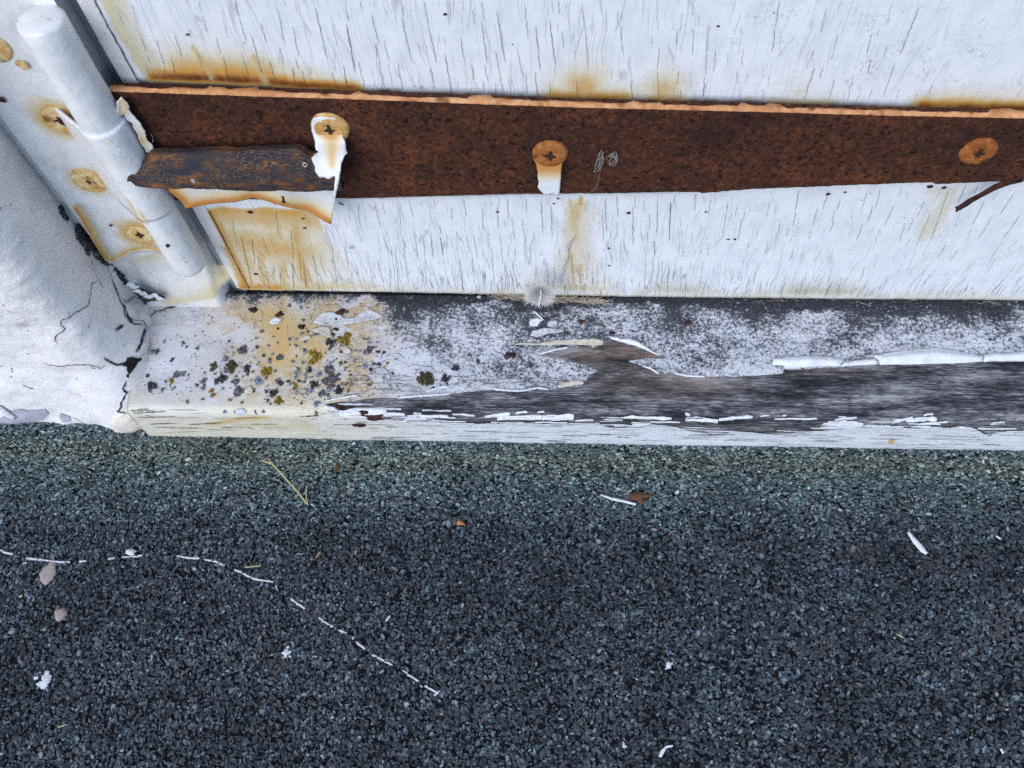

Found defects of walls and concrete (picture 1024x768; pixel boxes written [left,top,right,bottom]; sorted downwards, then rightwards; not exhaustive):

rust [33,101,73,137]
peeling [116,96,348,224]
rust [101,0,365,91]
rust [546,73,633,100]
rust [911,97,1024,109]
rust [73,200,170,262]
rust [165,207,334,304]
crack [42,262,427,429]
spalling [0,309,1024,768]